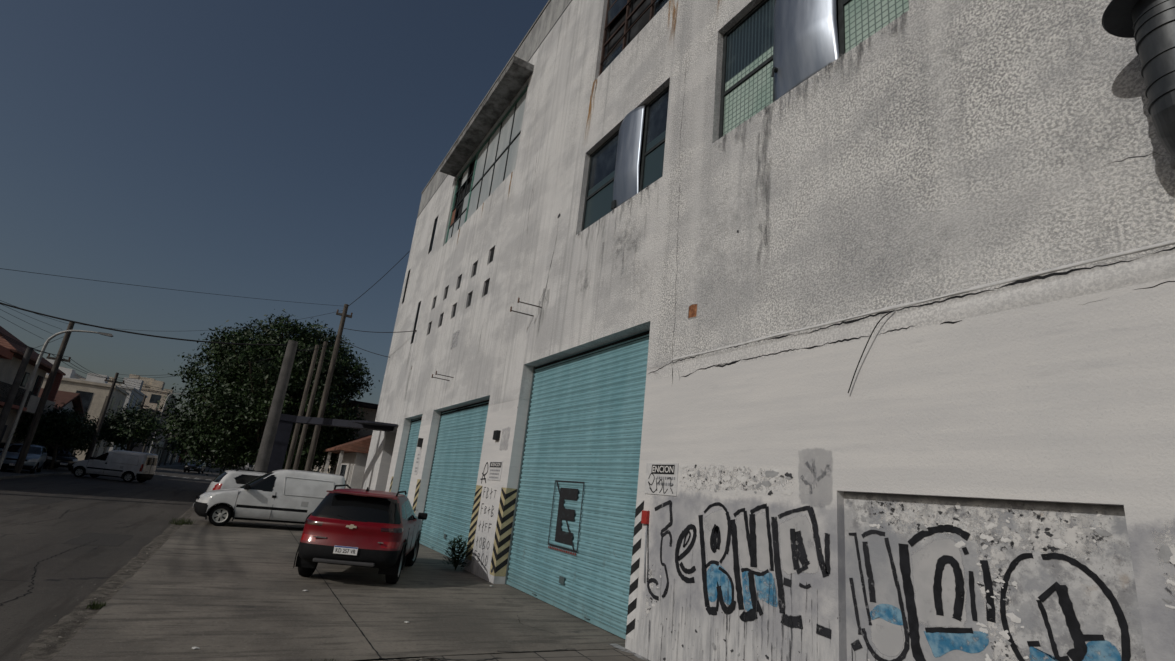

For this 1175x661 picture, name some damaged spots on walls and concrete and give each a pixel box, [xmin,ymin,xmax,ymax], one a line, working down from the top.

crack [650,247,1175,382]
peeling [680,462,828,496]
peeling [861,501,1112,661]